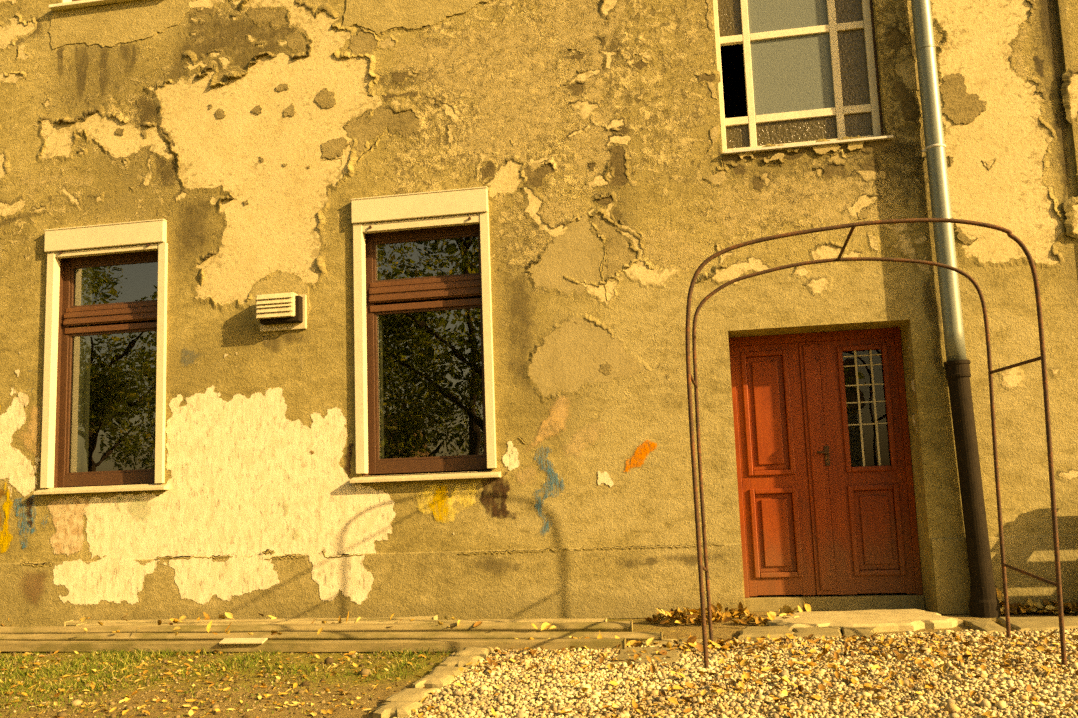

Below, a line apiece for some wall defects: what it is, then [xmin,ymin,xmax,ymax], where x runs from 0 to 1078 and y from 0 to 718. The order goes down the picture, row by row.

leakage [58,47,88,96]
flaking render [0,0,937,404]
flaking render [930,0,1078,269]